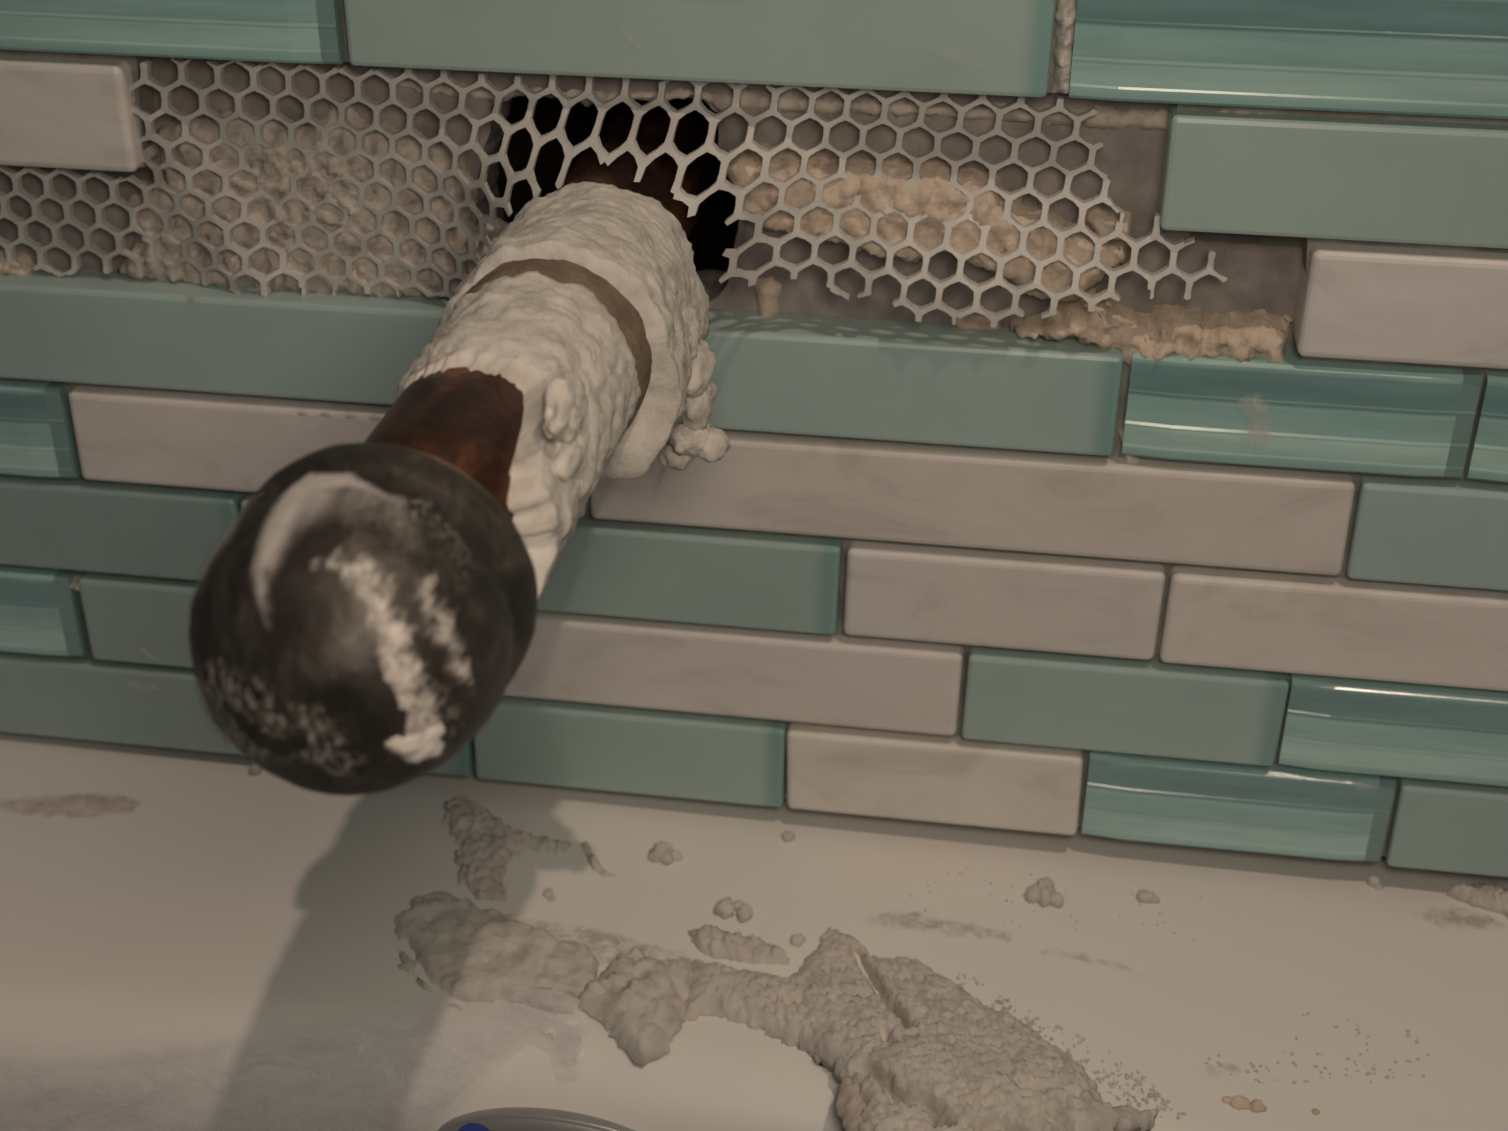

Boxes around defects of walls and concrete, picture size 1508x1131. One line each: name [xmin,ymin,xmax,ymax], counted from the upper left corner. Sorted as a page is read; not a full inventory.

peeling [0,57,1303,345]